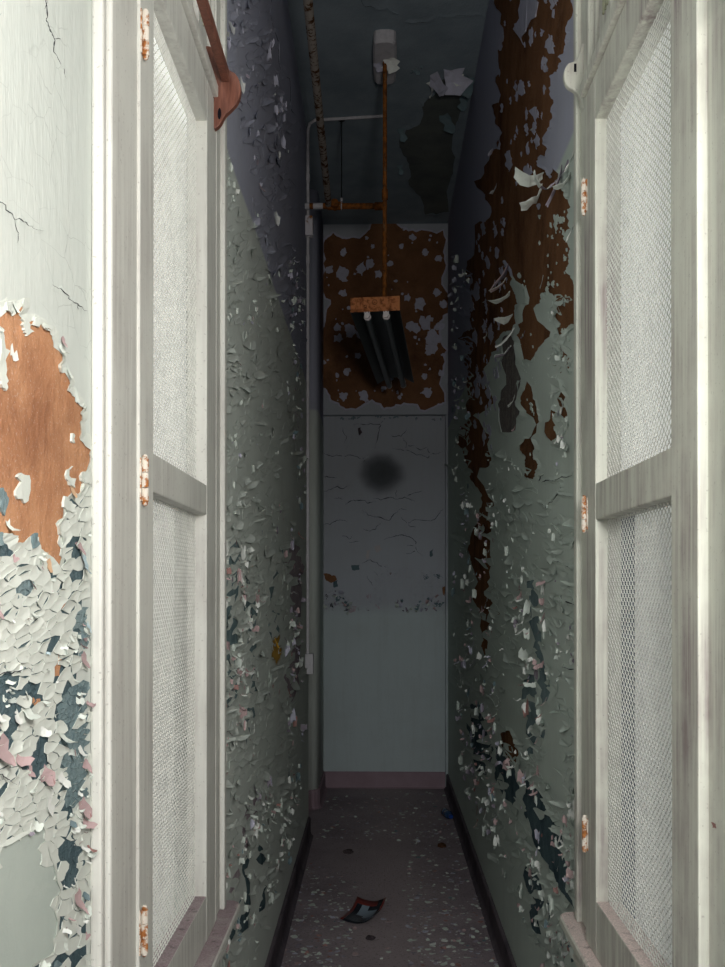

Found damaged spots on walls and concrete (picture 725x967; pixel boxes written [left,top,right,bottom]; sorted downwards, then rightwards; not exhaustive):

crack [41,0,69,80]
peeling [273,97,287,163]
crack [0,195,45,243]
crack [50,282,88,314]
peeling [323,68,475,421]
peeling [0,297,93,575]
peeling [219,130,308,967]
peeling [448,0,576,967]
peeling [0,821,63,967]